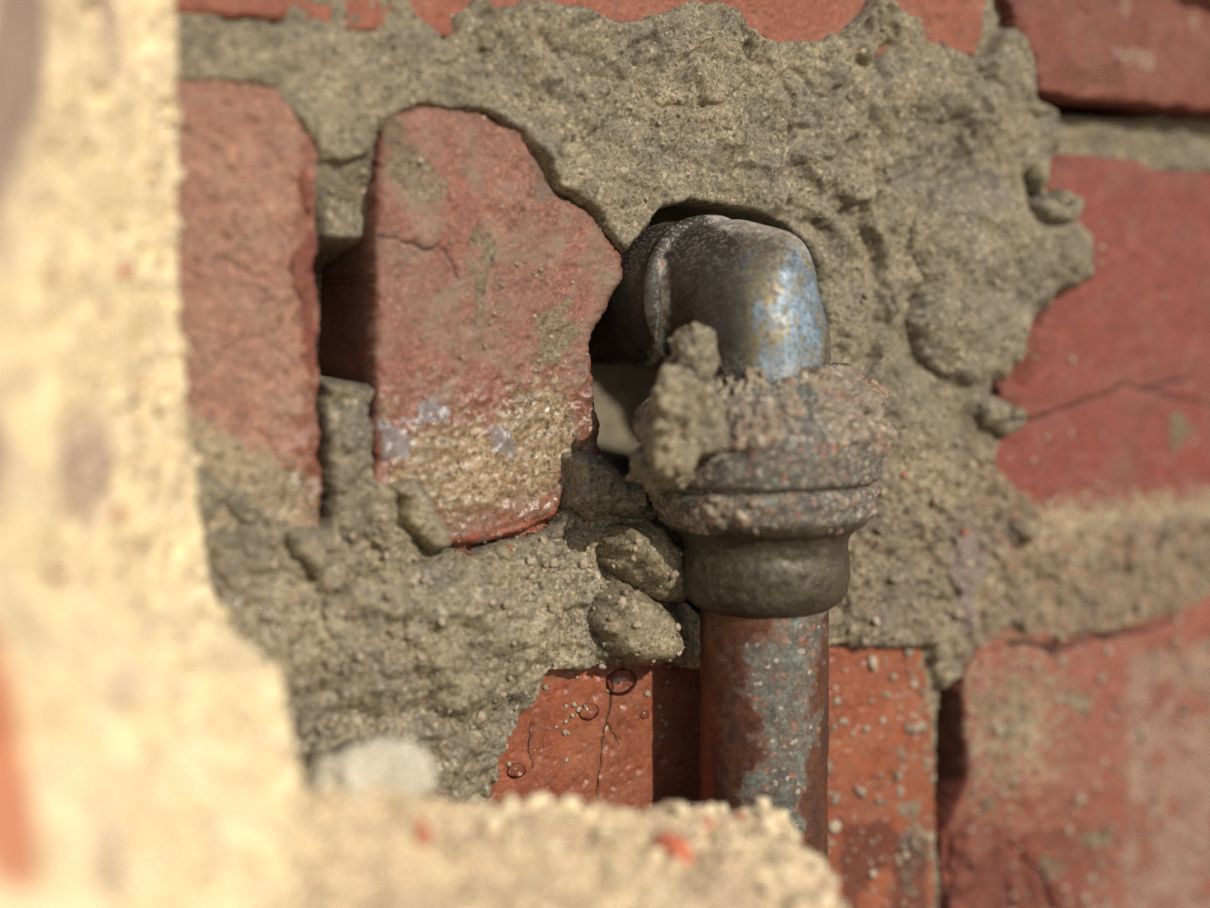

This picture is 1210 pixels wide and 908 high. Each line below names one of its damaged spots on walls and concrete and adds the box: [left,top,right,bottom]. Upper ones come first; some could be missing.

crack [1023,174,1077,206]
crack [378,234,459,281]
crack [990,379,1210,423]